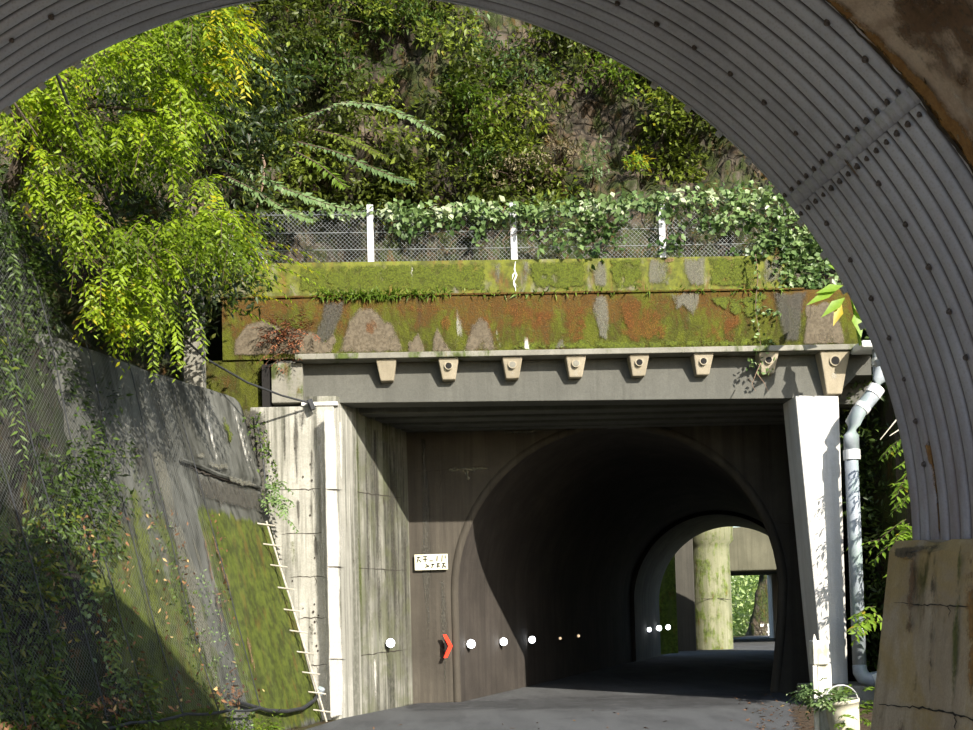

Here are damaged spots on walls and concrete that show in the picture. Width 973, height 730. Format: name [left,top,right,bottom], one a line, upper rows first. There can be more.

corrosion [828,0,973,167]
leakage [317,302,343,342]
leakage [594,295,608,339]
leakage [284,412,304,473]
leakage [357,431,407,632]
leakage [297,410,343,717]
crack [894,602,967,615]
crack [879,704,973,728]